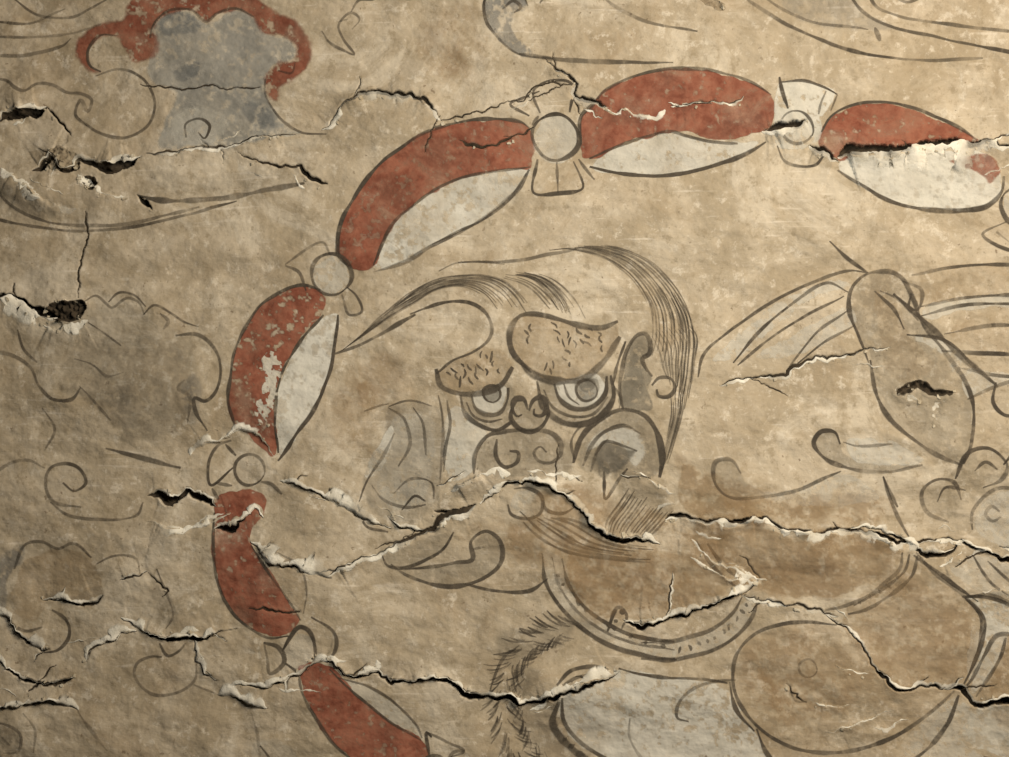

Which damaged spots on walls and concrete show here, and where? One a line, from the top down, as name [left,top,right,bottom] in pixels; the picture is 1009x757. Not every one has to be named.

crack [140,83,261,91]
crack [321,54,744,152]
crack [762,119,1009,175]
crack [0,103,328,335]
spalling [43,299,87,322]
spalling [895,380,956,428]
crack [189,423,273,456]
crack [41,571,169,606]
crack [148,444,1009,733]
crack [0,606,619,713]